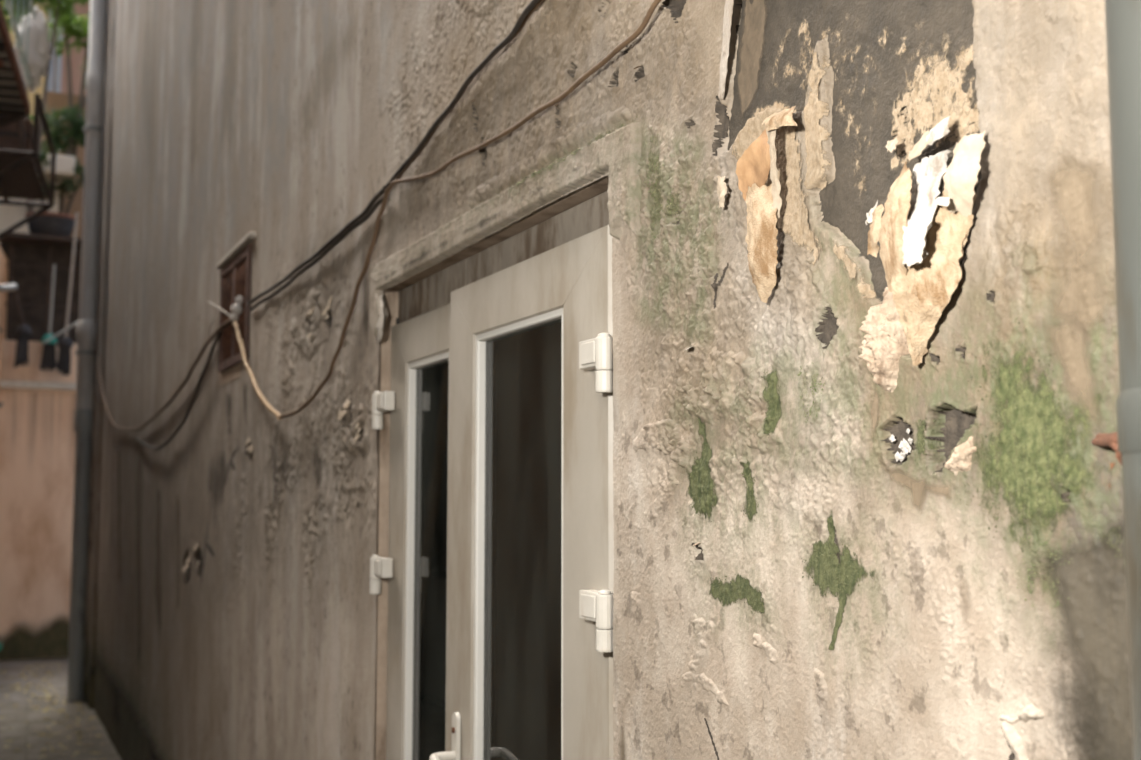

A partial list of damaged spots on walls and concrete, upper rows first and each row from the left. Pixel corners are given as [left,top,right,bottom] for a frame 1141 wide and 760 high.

spalling [712,0,986,393]
spalling [881,409,977,476]
peeling [182,543,203,584]
peeling [999,704,1044,760]